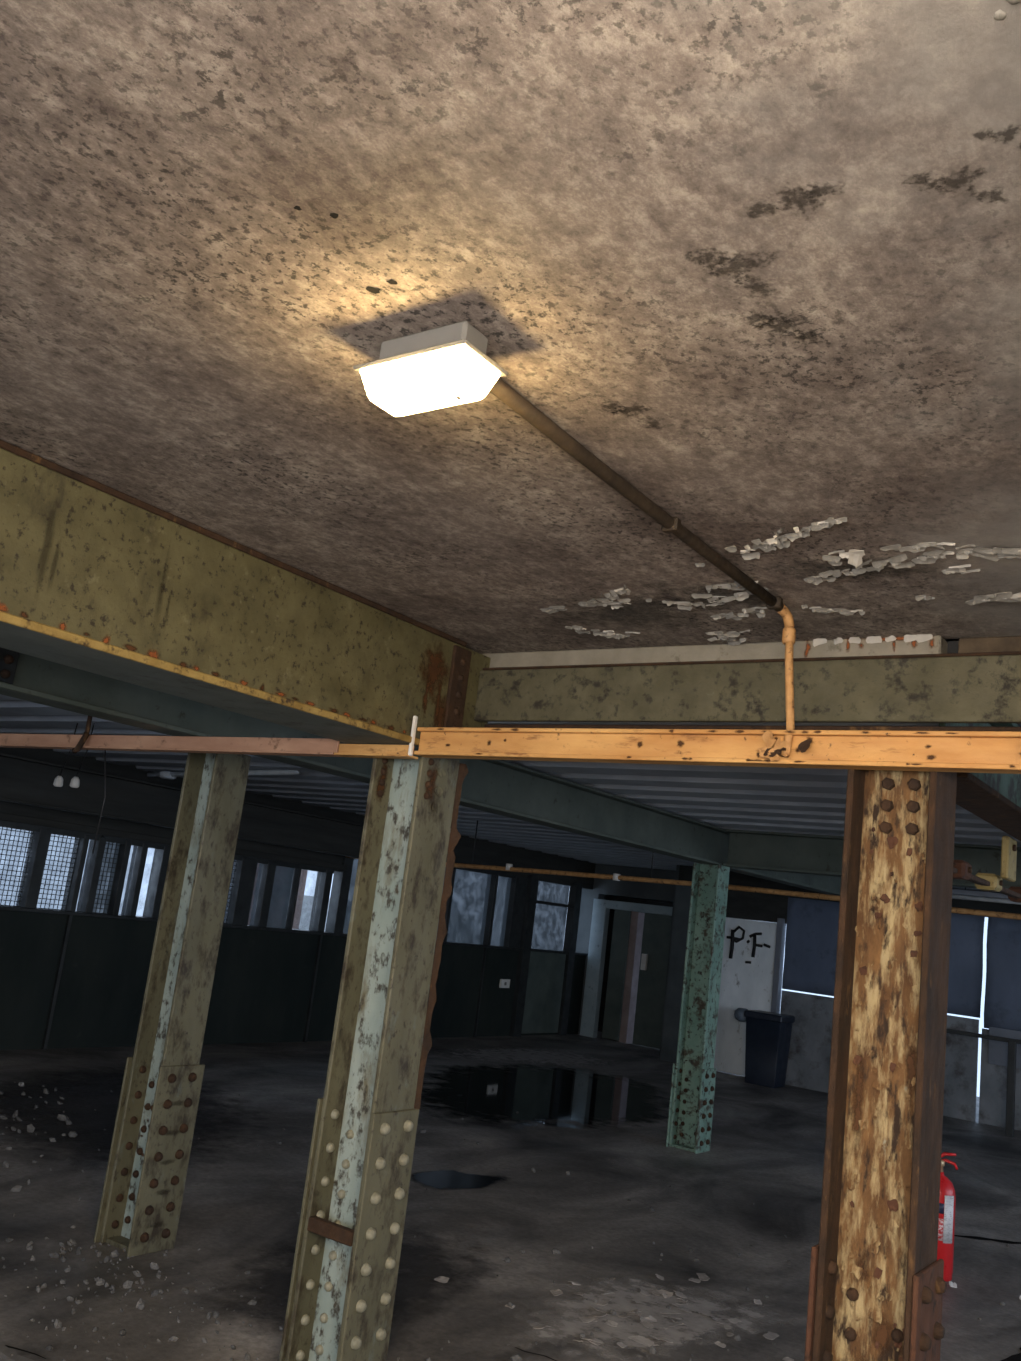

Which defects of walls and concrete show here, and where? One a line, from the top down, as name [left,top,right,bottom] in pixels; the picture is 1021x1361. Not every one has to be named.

peeling [724,517,847,560]
peeling [803,542,1021,585]
peeling [540,581,769,646]
peeling [965,592,1021,605]
spalling [804,634,934,657]
rust [420,645,450,746]
rust [869,827,926,864]
rust [855,872,923,1008]
rust [852,1033,918,1134]
rust [841,1142,911,1361]
crack [0,1338,46,1361]
crack [1001,1348,1021,1361]